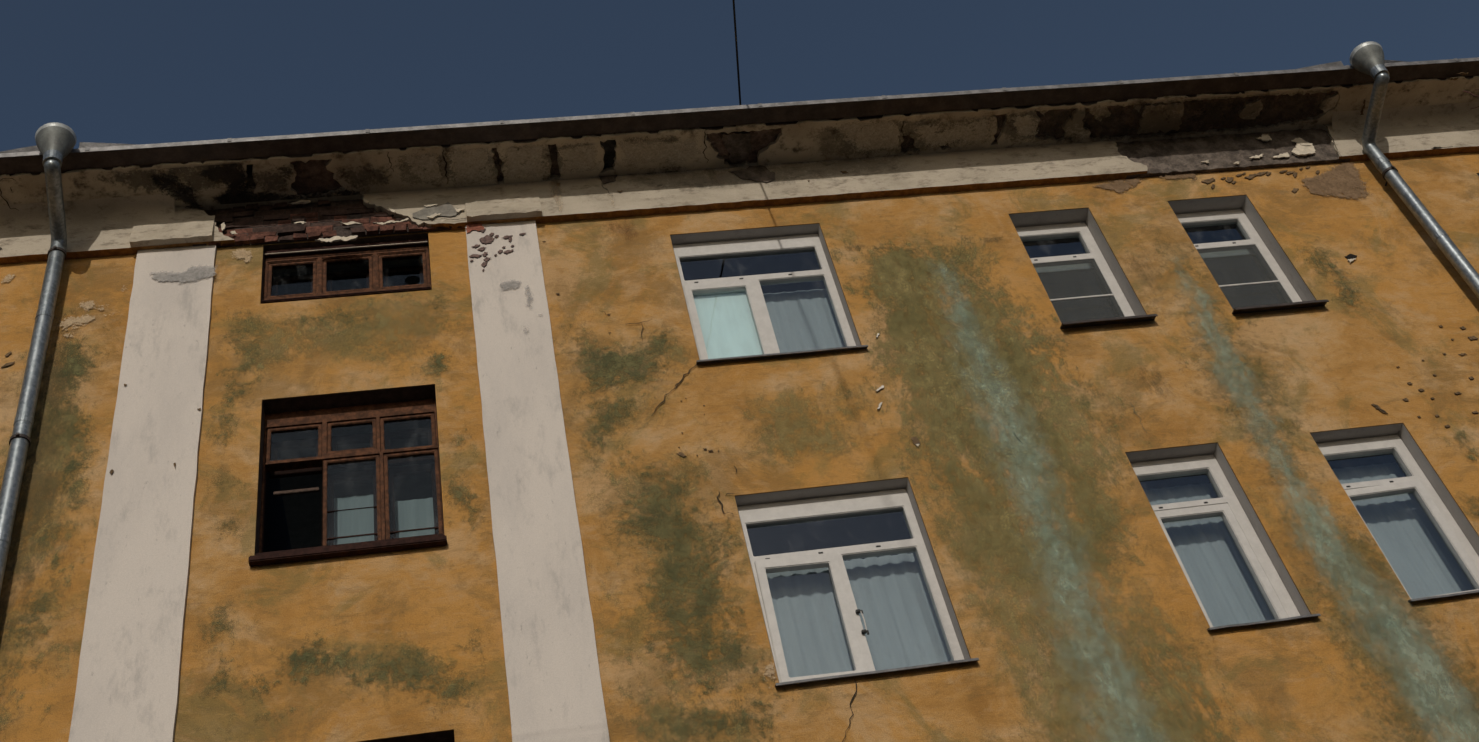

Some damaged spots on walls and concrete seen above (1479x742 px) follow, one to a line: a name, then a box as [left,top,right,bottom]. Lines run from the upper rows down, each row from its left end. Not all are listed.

spalling [492,148,504,182]
spalling [548,144,560,186]
spalling [599,140,623,193]
spalling [706,128,781,183]
spalling [1035,91,1373,201]
flaking render [192,159,526,271]
crack [842,679,857,742]